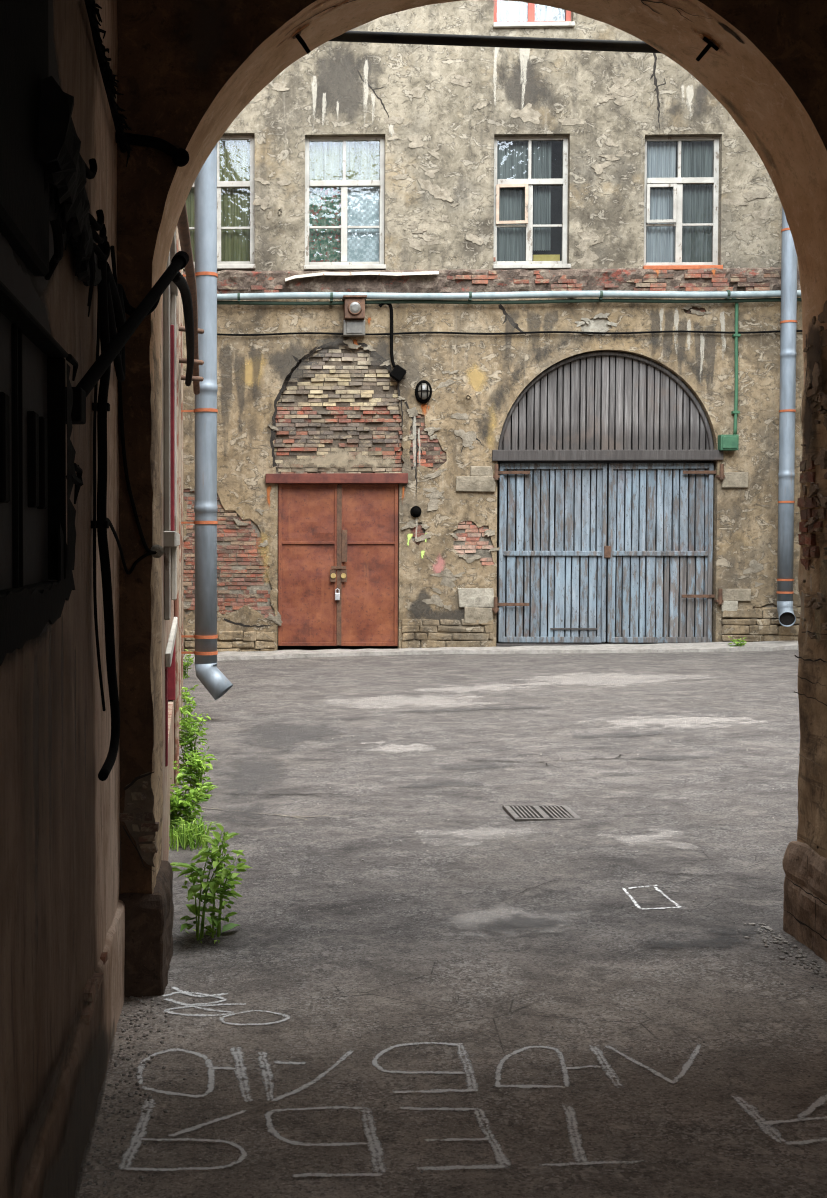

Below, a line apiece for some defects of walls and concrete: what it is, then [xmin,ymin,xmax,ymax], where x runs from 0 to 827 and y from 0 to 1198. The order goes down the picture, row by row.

crack [641,0,708,23]
water stain [313,52,381,118]
peeling [510,103,585,126]
peeling [599,76,635,106]
crack [650,53,666,128]
peeling [383,116,484,253]
peeling [589,138,626,179]
peeling [447,229,611,291]
flaking render [268,339,476,545]
spalling [183,487,195,619]
spalling [217,493,282,626]
spalling [422,521,500,611]